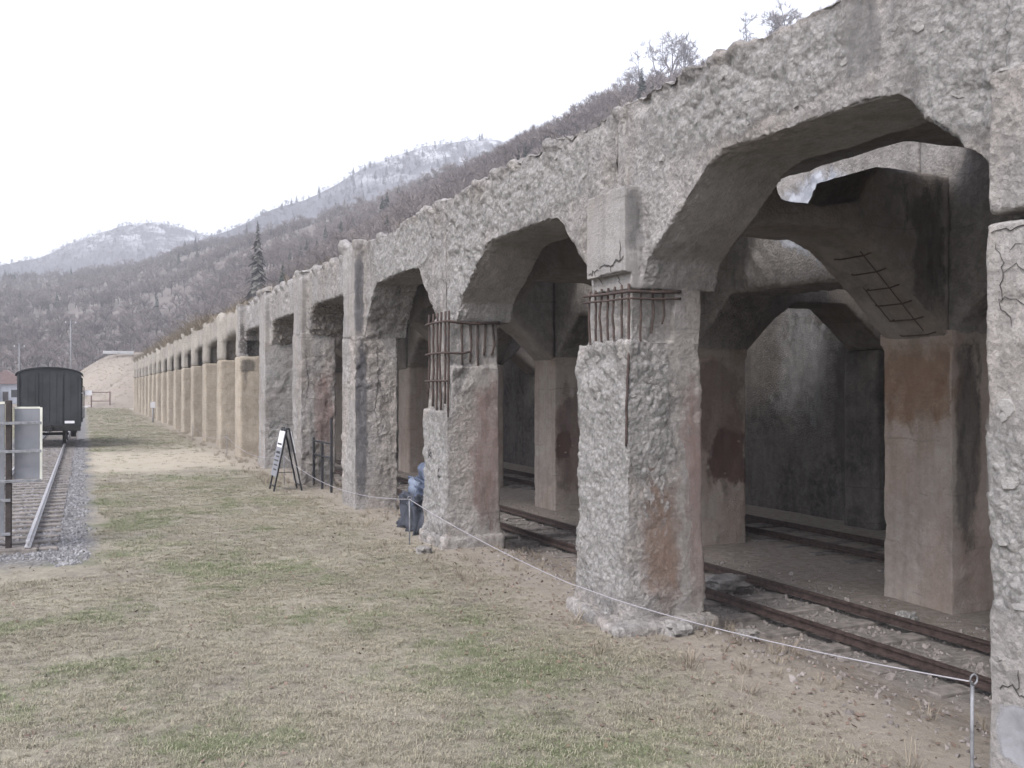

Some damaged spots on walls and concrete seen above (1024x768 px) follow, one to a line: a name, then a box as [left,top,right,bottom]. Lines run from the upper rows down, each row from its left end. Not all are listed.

spalling [369,135,596,538]
crack [589,241,623,285]
spalling [834,251,936,337]
crack [991,224,1024,324]
spalling [556,283,684,624]